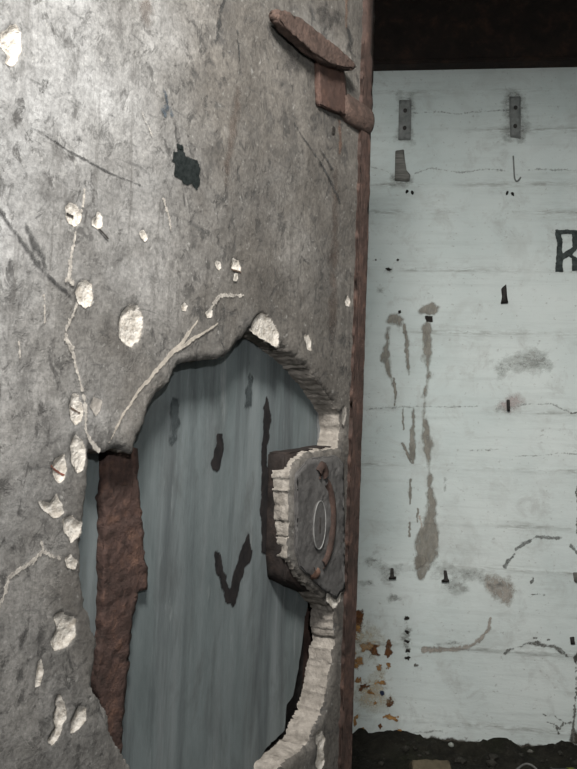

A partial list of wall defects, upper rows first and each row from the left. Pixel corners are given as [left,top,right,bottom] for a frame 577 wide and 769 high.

crack [64,189,100,453]
spalling [119,305,143,348]
crack [209,293,244,310]
water stain [380,310,410,406]
water stain [401,302,439,464]
crack [0,541,61,607]
corrosion [90,447,148,754]
spalling [242,313,347,769]
water stain [408,474,438,580]
corrosion [354,610,402,731]
crack [569,653,577,742]